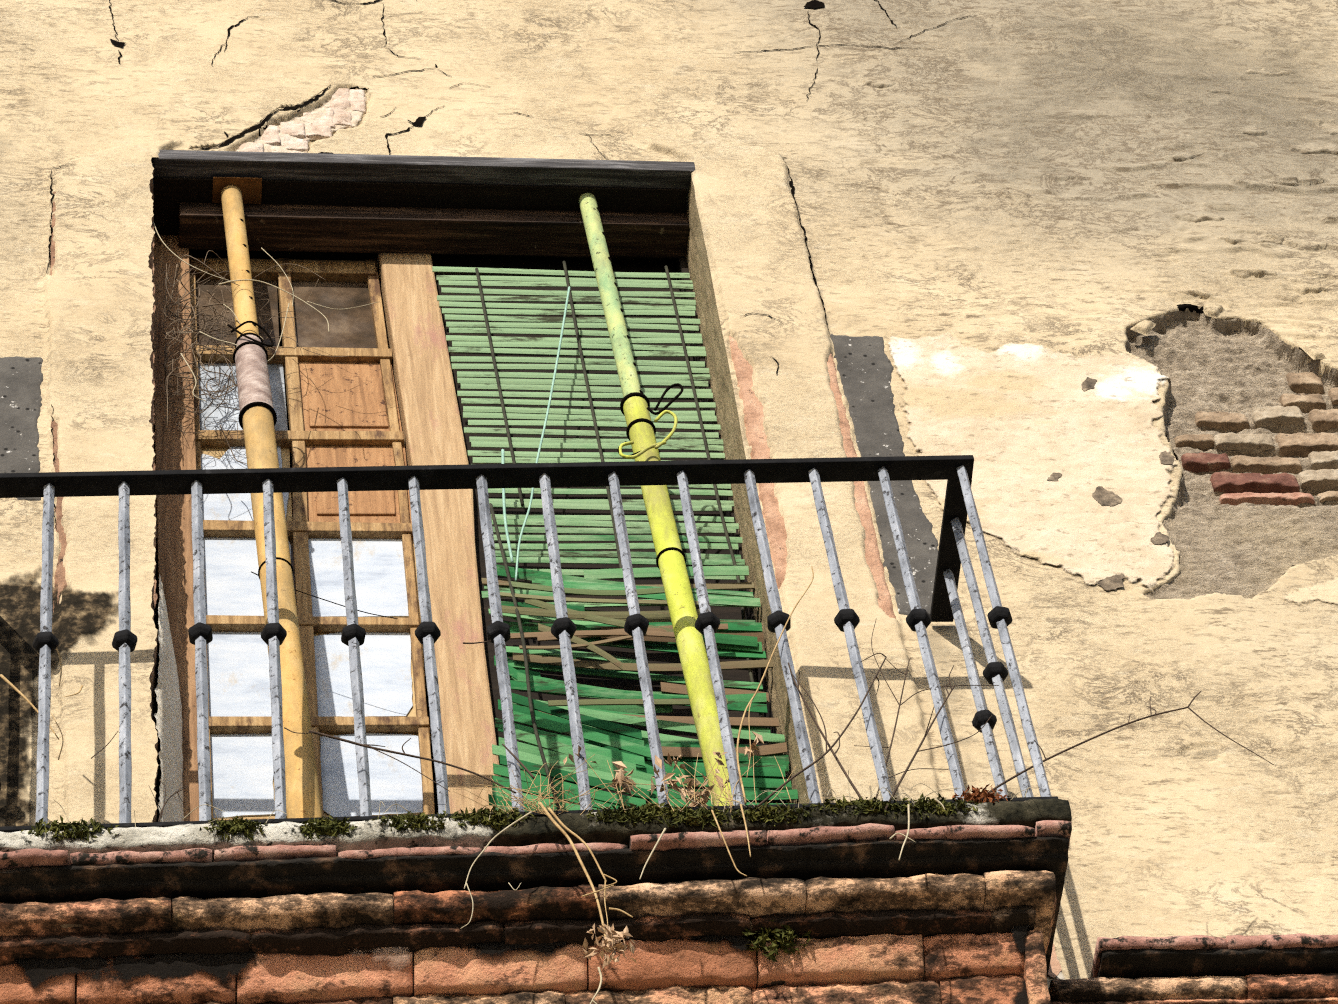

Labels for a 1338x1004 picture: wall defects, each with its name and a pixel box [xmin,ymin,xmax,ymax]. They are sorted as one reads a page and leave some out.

crack [109,0,122,63]
spalling [236,88,366,153]
crack [188,0,529,155]
crack [739,0,975,100]
crack [46,164,76,273]
crack [783,157,830,334]
peeling [888,300,1338,604]